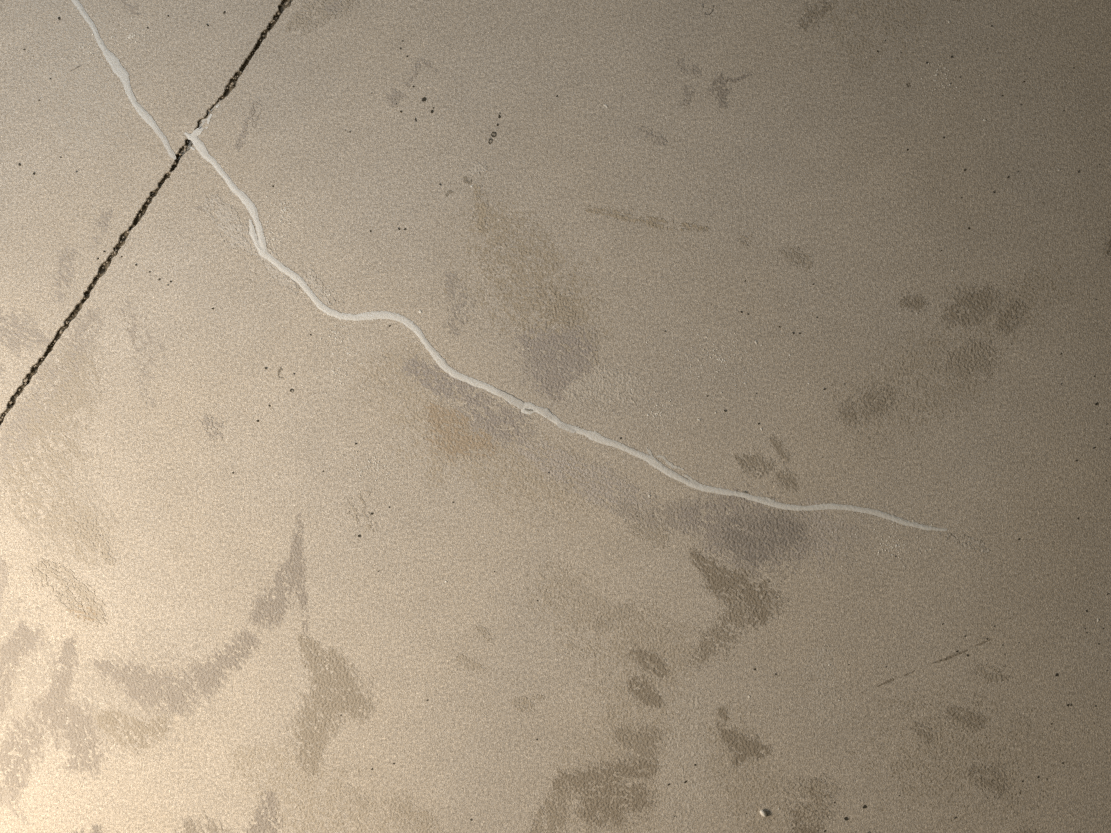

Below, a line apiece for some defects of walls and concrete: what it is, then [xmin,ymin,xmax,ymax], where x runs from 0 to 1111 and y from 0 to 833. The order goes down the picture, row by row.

crack [496,390,576,433]